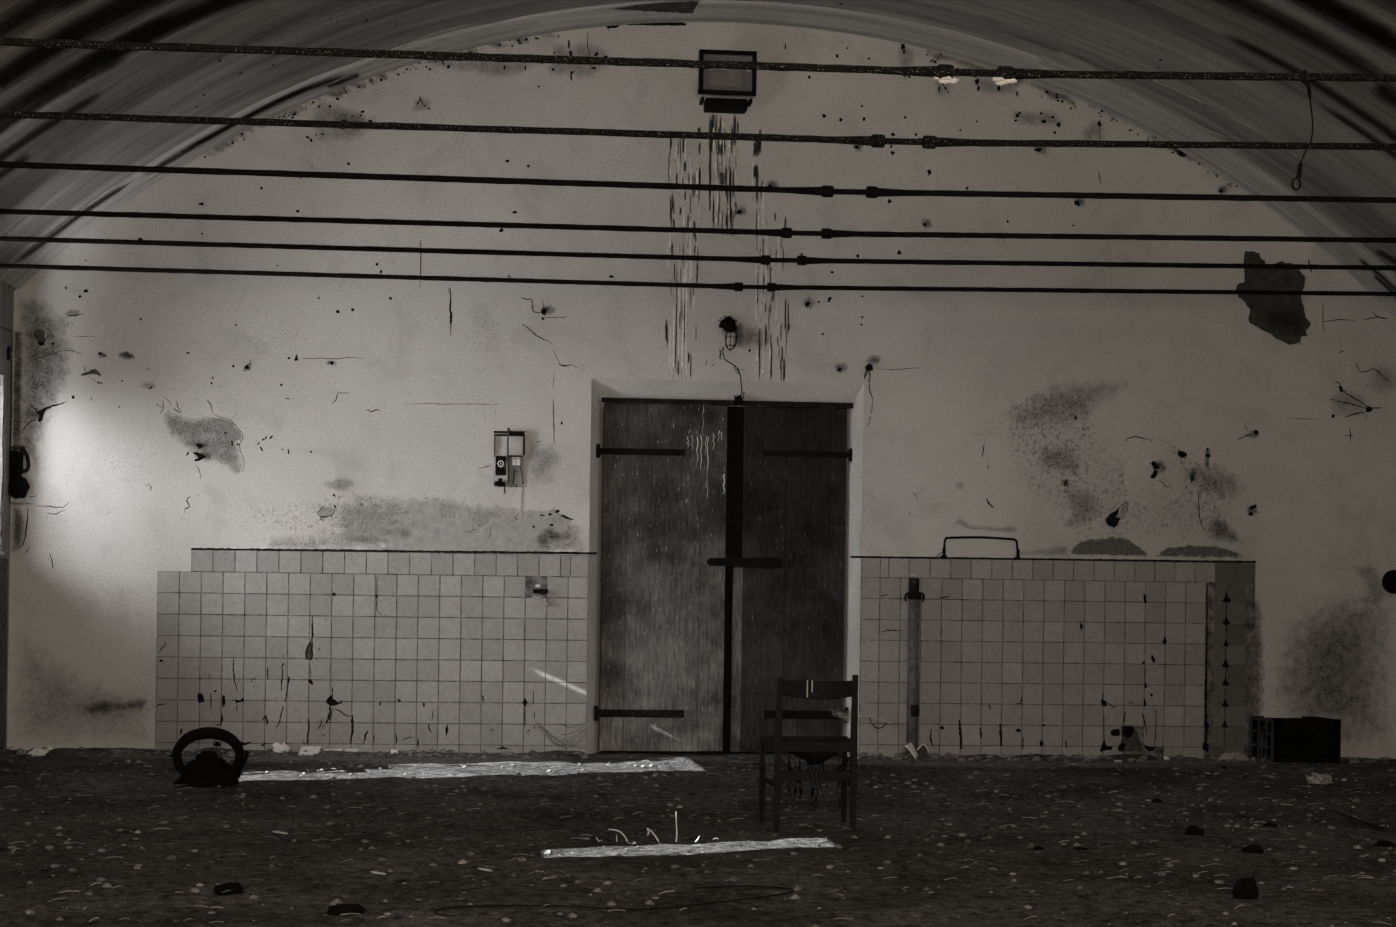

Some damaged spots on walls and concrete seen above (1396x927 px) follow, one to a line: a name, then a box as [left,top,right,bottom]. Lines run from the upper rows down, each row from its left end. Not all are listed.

water stain [665,115,790,381]
flaking render [1235,251,1311,346]
peeling [71,351,245,477]
peeling [318,494,578,552]
water stain [1073,516,1238,558]
water stain [1285,613,1374,736]